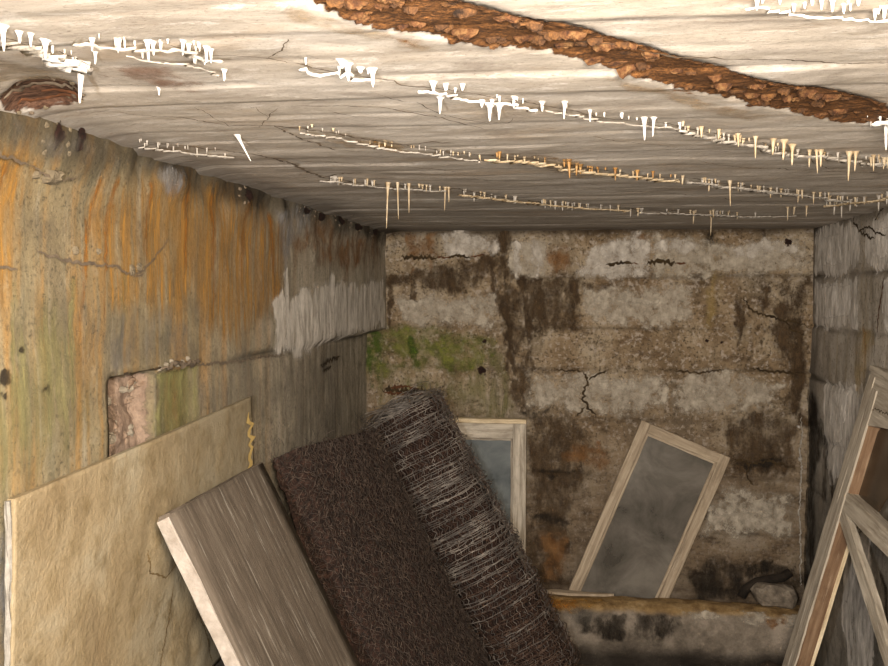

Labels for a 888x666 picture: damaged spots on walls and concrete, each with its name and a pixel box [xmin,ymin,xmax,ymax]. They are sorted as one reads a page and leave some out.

spalling [0,76,85,115]
leakage [0,24,228,103]
crack [92,40,885,240]
leakage [299,124,888,246]
leakage [418,81,888,181]
leakage [746,0,888,23]
corrosion [104,178,283,338]
leakage [386,231,609,585]
crack [555,369,606,417]
leakage [689,279,833,600]